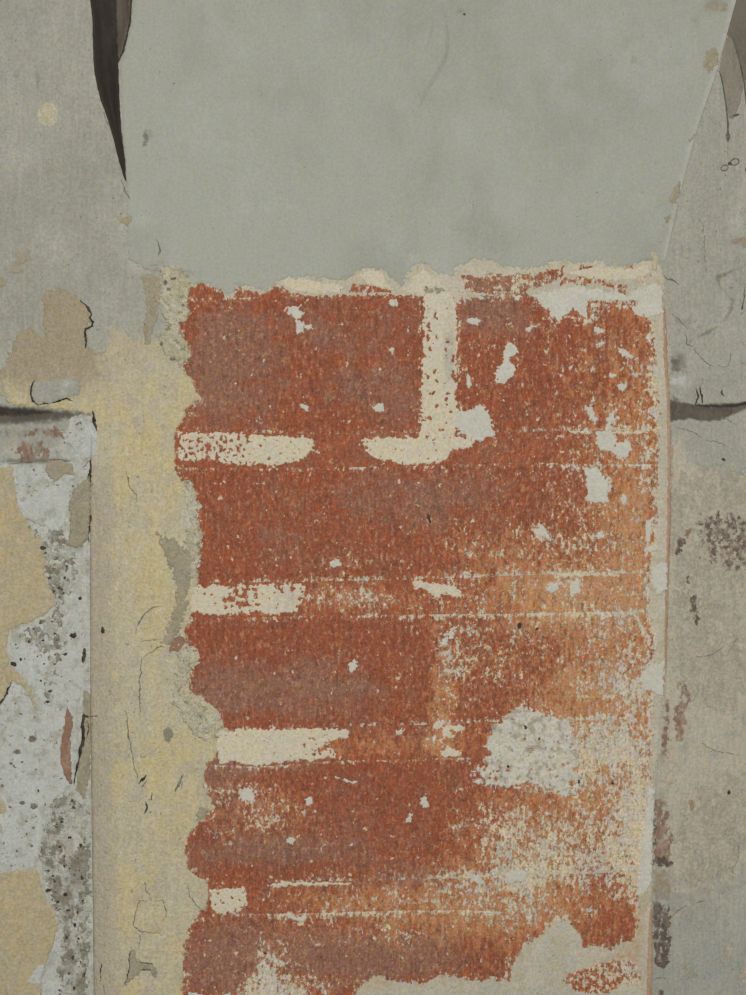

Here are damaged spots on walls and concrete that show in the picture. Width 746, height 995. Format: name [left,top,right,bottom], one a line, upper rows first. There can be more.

flaking render [140,265,192,368]
flaking render [31,377,82,405]
crack [30,380,97,431]
flaking render [62,413,99,461]
crack [671,313,745,447]
flaking render [156,480,224,743]
peeling [0,467,94,995]
peeling [123,949,157,986]